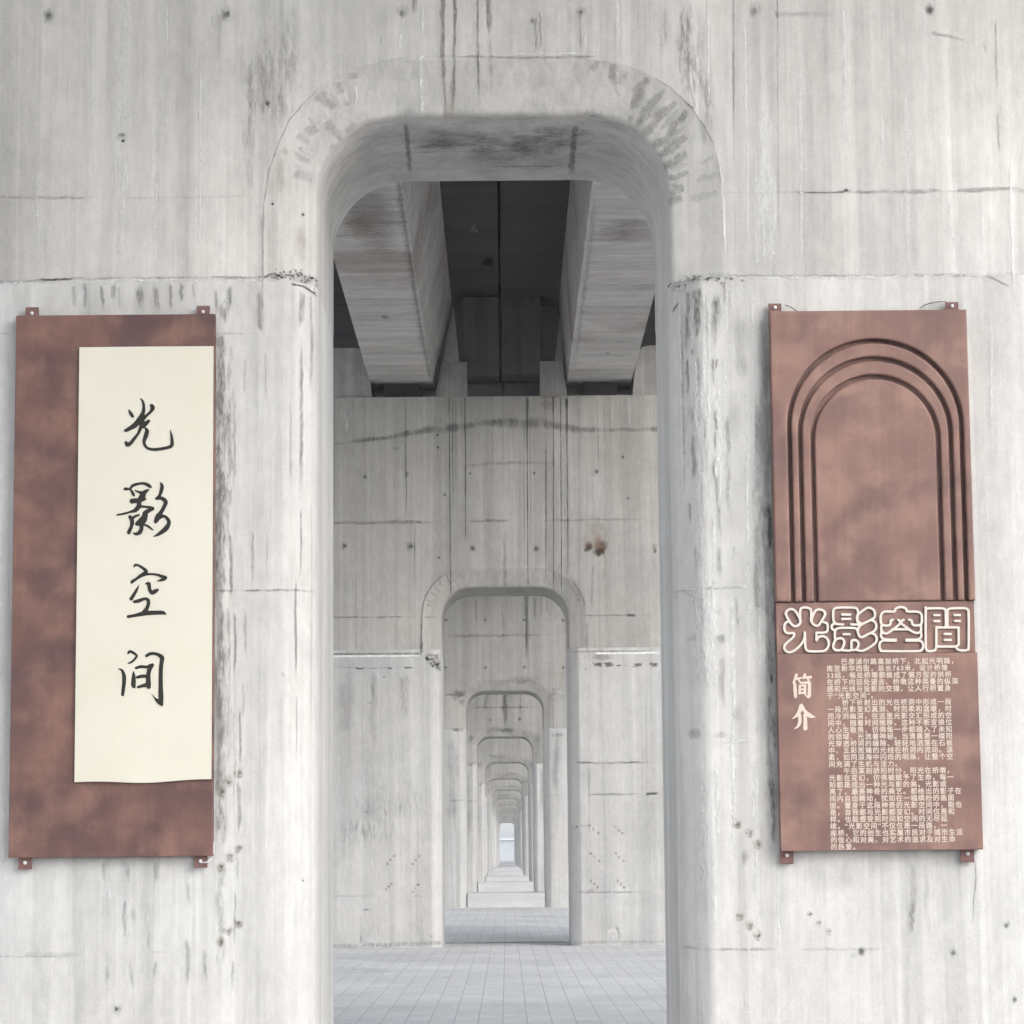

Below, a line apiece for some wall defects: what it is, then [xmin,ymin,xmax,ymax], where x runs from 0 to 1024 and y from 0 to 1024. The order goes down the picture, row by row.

corrosion [585,538,605,556]